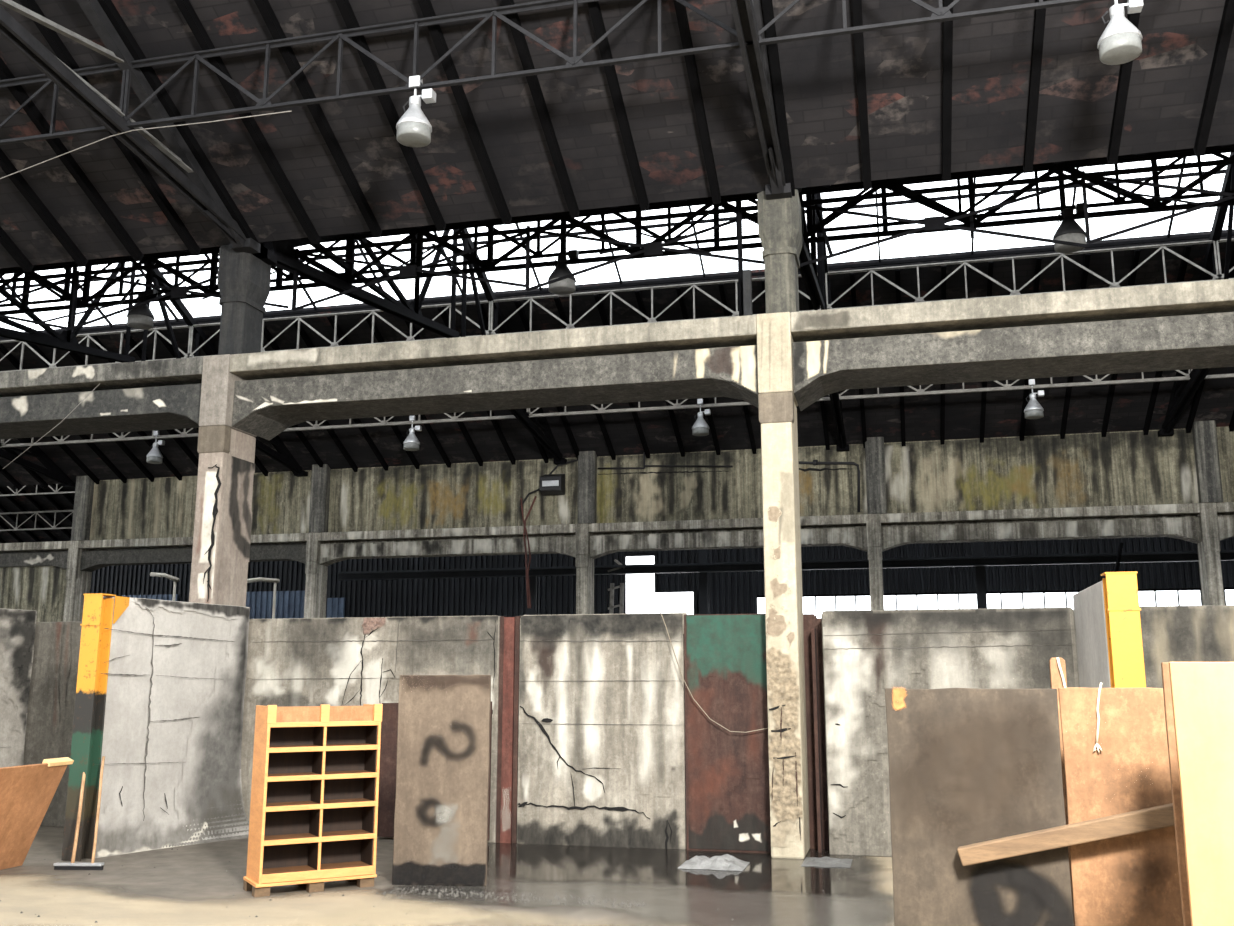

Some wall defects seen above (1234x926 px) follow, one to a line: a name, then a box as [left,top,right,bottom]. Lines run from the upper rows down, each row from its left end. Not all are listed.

crack [203,464,221,602]
leakage [227,455,259,562]
leakage [320,469,578,558]
leakage [777,455,854,550]
leakage [883,448,1199,541]
crack [95,607,233,821]
crack [342,616,395,706]
crack [488,620,496,689]
crack [518,706,672,849]
leakage [517,620,771,851]
corrosion [687,651,766,830]
spalling [686,545,803,847]